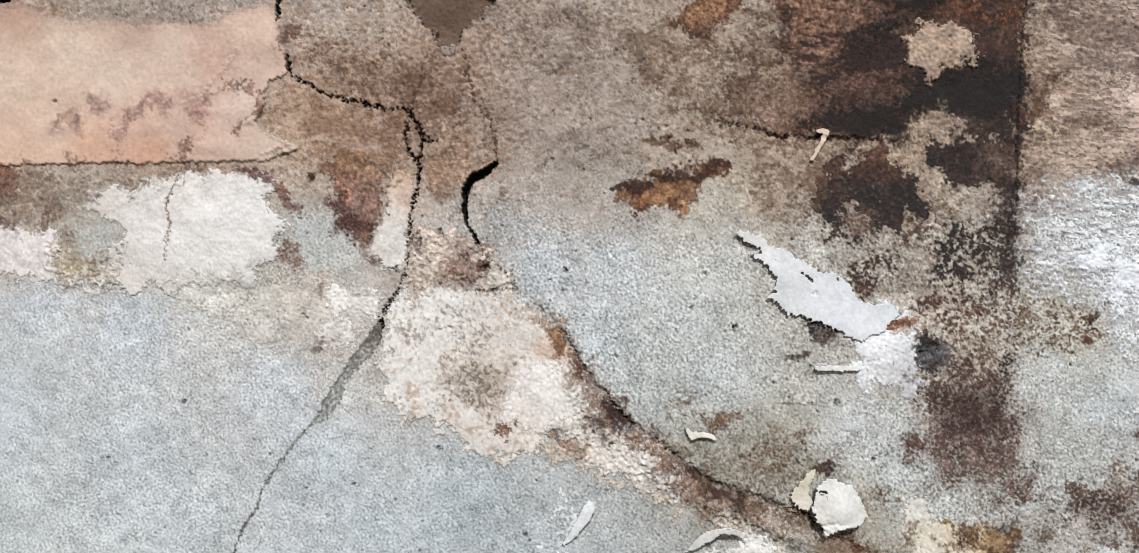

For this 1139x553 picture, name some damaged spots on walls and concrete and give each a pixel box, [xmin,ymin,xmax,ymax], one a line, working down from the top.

crack [275,0,283,21]
corrosion [664,0,741,41]
crack [461,49,516,294]
corrosion [609,134,732,221]
water stain [610,0,1139,301]
peeling [985,0,1139,371]
crack [233,56,438,553]
peeling [0,166,868,553]
water stain [785,318,838,362]
peeling [735,229,930,402]
water stain [900,329,1039,506]
peeling [898,491,1121,553]